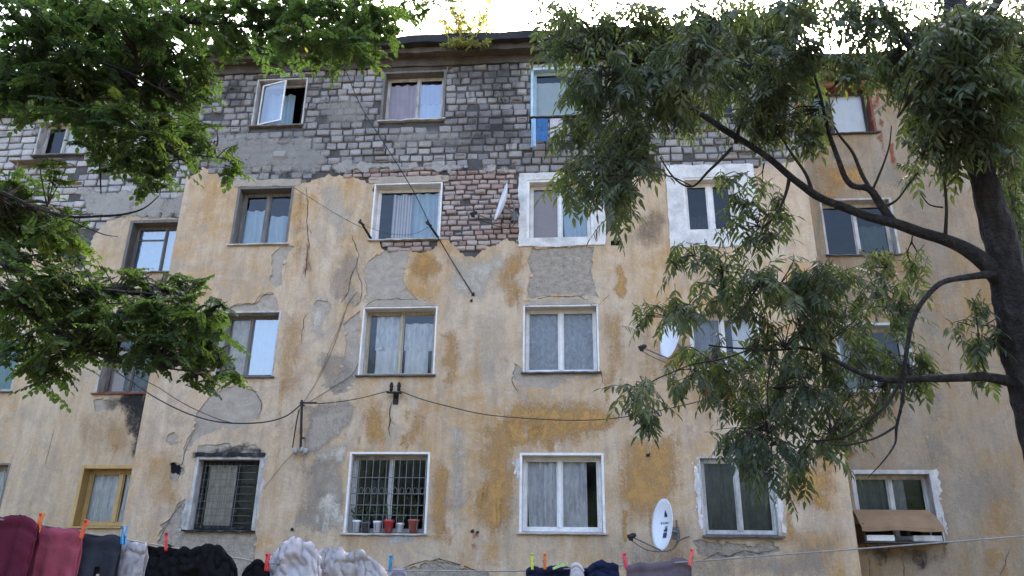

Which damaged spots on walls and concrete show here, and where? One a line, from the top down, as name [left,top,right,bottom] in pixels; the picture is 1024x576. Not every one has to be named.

crack [304,190,312,275]
crack [318,237,434,376]
spalling [363,247,417,303]
spalling [524,246,598,301]
peeling [304,312,361,533]
spalling [156,384,267,576]
spalling [691,457,787,559]